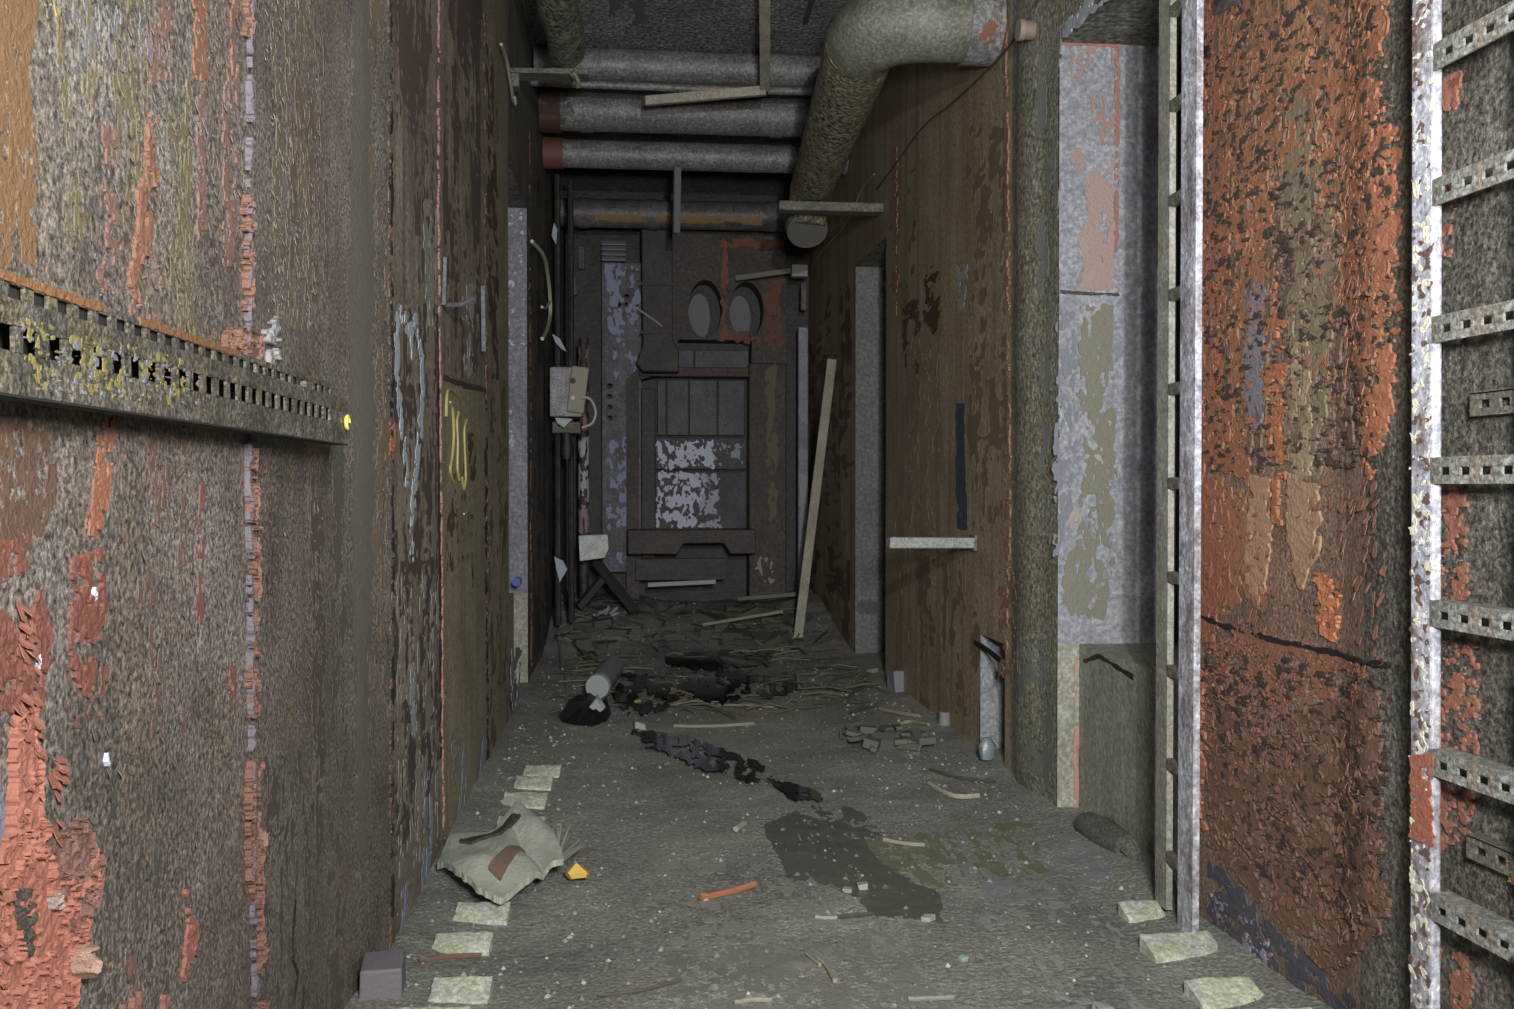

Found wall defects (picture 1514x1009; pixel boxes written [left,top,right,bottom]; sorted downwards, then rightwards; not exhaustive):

peeling [1062,0,1121,292]
peeling [578,345,744,564]
peeling [765,364,779,522]
rust [1201,474,1267,615]
leakage [630,805,1153,1009]